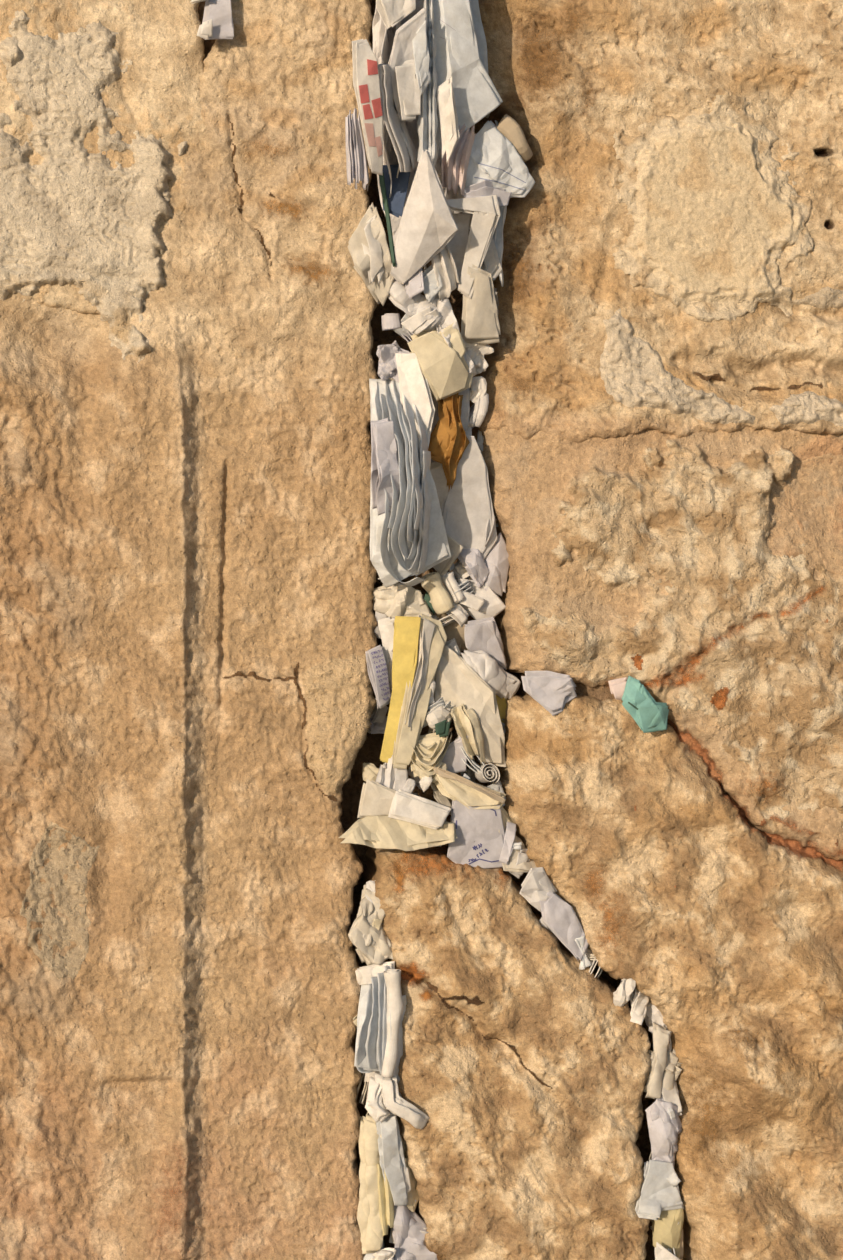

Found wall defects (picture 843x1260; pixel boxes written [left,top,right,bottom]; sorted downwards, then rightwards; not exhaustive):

peeling [0,8,188,363]
crack [229,121,292,275]
crack [667,720,843,871]